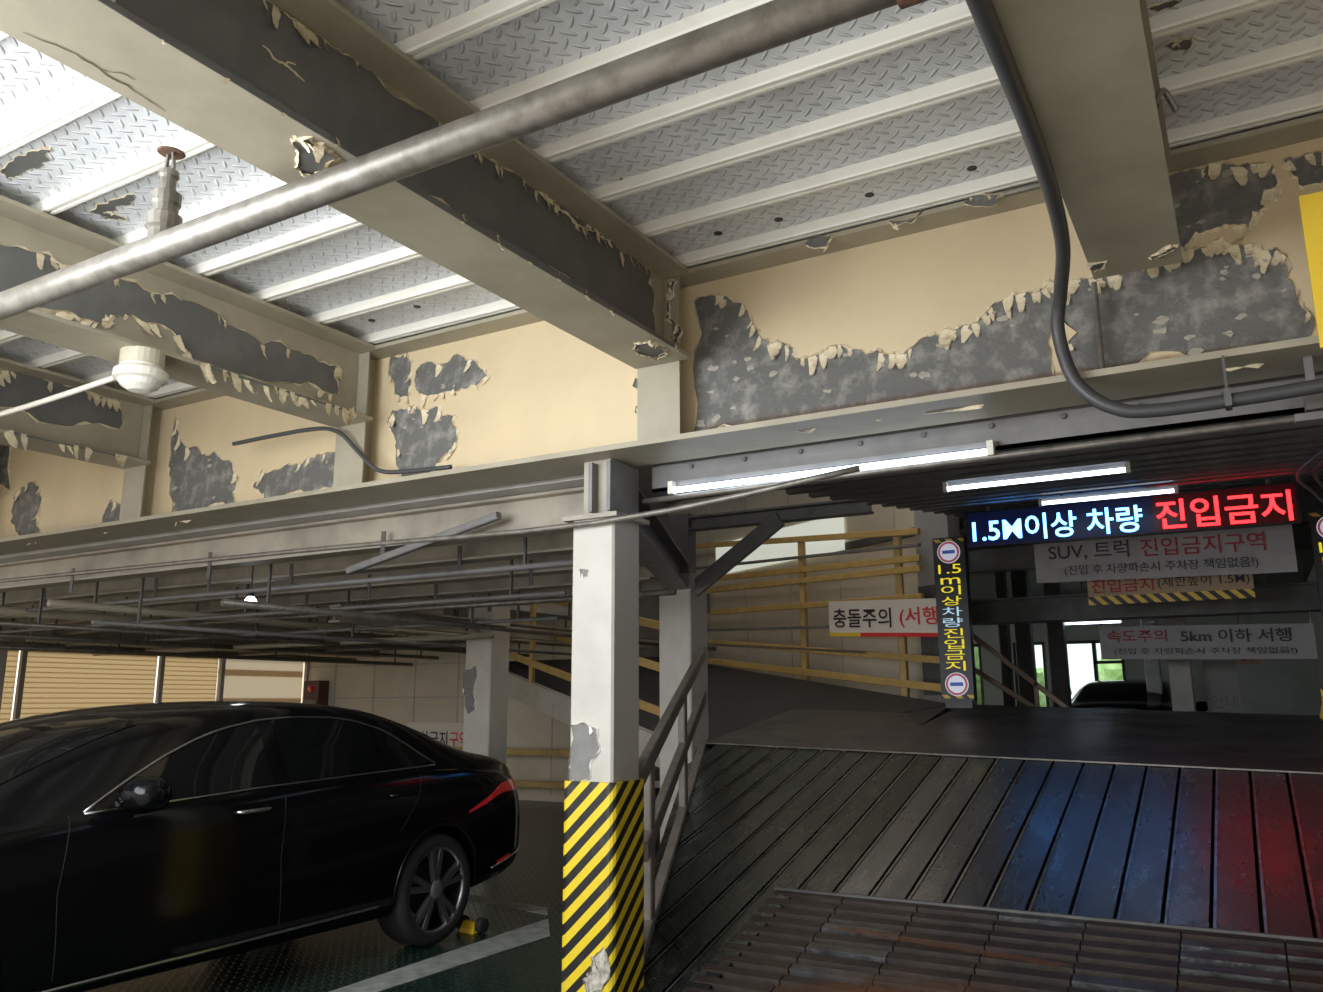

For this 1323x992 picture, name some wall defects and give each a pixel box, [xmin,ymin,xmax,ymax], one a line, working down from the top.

peeling [98,0,443,177]
peeling [0,147,53,179]
peeling [0,244,70,292]
peeling [89,193,135,221]
peeling [35,278,357,425]
peeling [396,151,1323,433]
peeling [0,371,128,548]
peeling [167,416,335,526]
peeling [387,353,490,477]